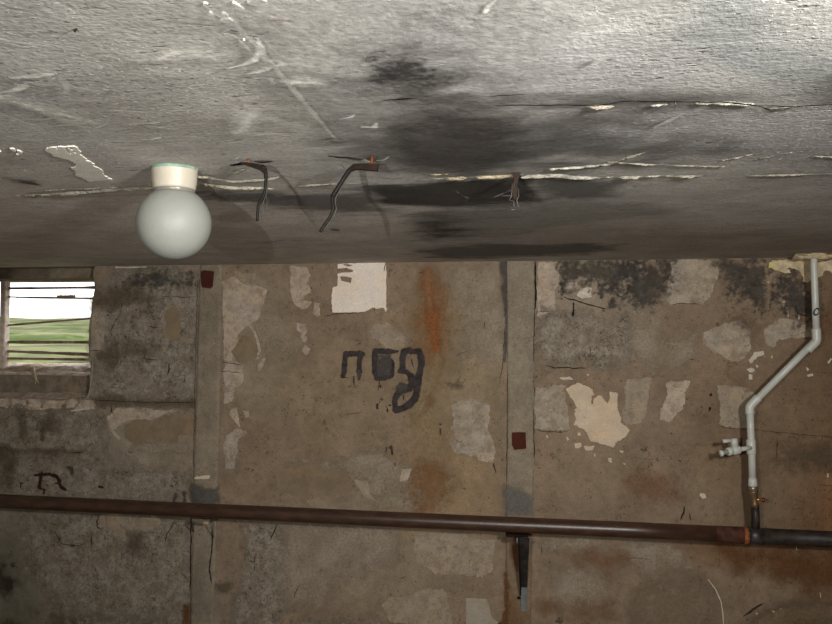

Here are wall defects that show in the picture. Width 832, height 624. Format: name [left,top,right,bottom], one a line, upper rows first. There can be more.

crack [487,94,832,110]
damp [555,259,677,309]
flaking render [665,259,719,306]
damp [714,258,812,327]
peeling [0,266,199,503]
flaking render [222,271,267,470]
flaking render [447,397,496,463]
peeling [534,261,652,456]
flaking render [659,380,690,422]
flaking render [702,301,812,429]